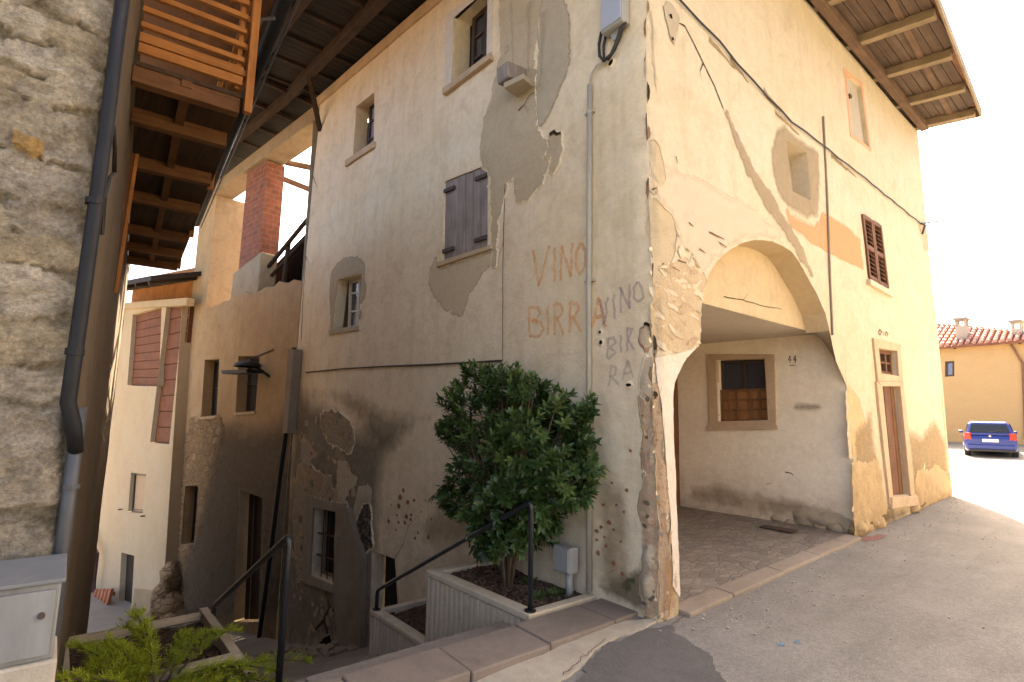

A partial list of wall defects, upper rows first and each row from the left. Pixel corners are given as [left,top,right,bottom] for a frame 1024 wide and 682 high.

peeling [428,0,565,317]
leakage [184,402,405,644]
flaking render [292,408,375,645]
peeling [602,118,707,621]
leakage [857,419,876,463]
leakage [910,425,948,477]